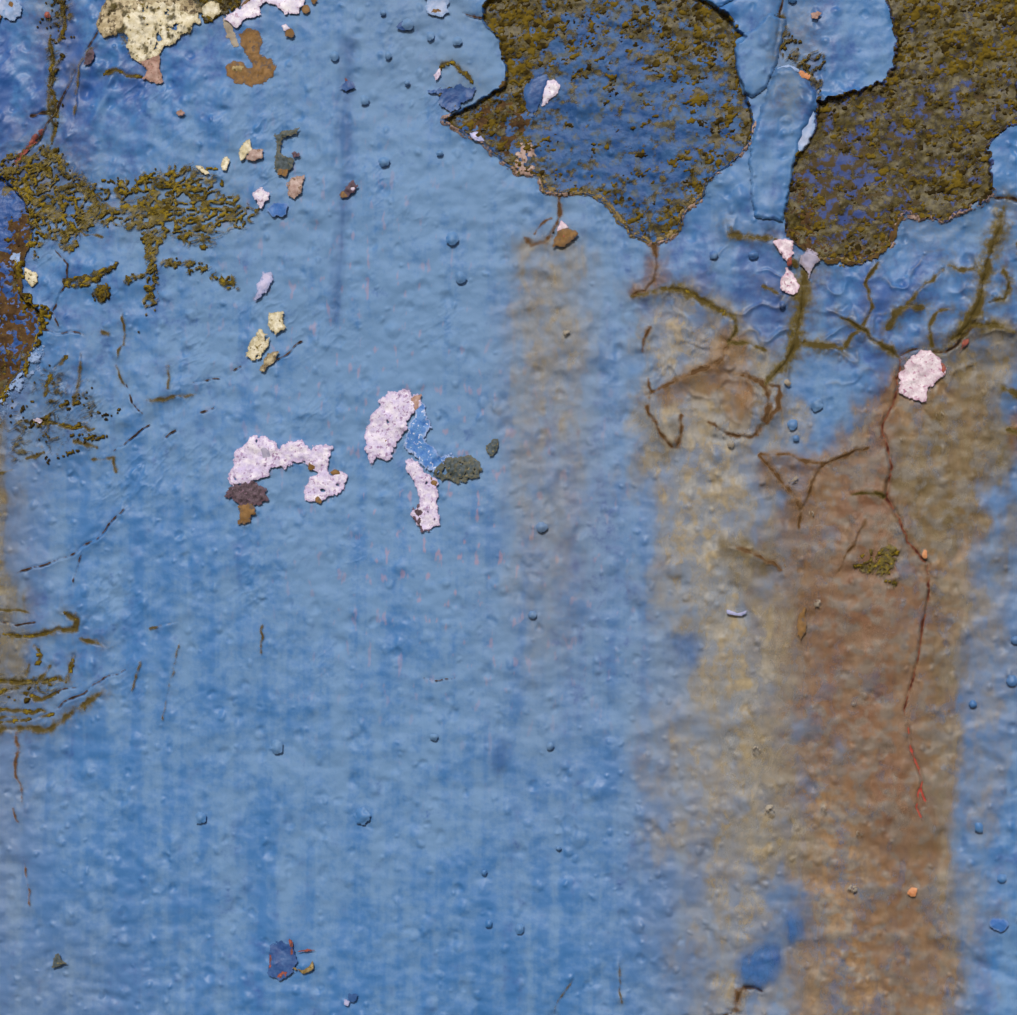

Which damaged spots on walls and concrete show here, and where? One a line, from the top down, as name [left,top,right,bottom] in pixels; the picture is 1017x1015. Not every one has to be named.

peeling [14,129,43,166]
peeling [96,0,318,84]
peeling [440,0,1017,295]
peeling [0,174,53,424]
peeling [433,439,499,484]
crack [631,196,1017,818]
crack [0,608,141,822]
corrosion [719,319,1017,1015]